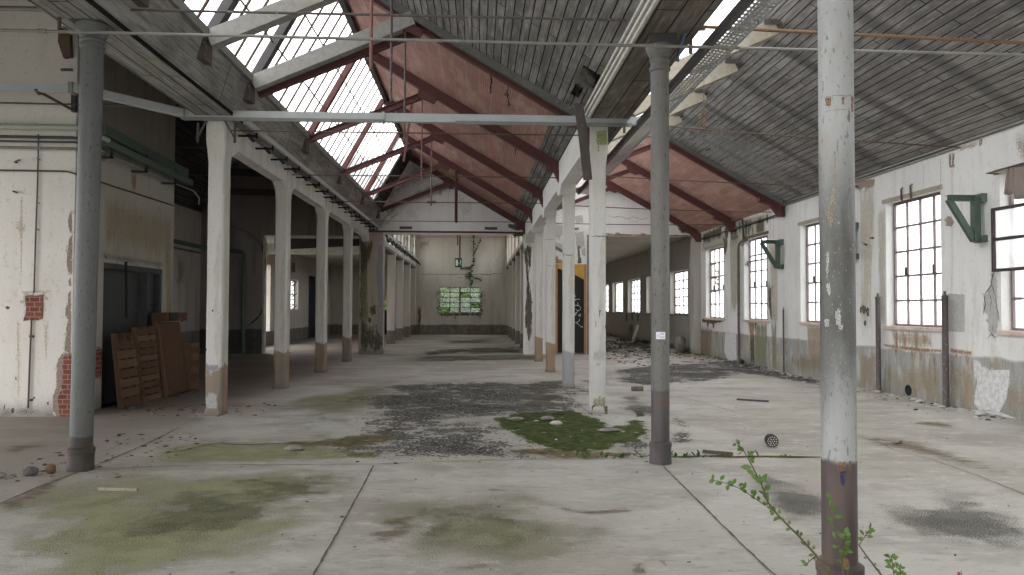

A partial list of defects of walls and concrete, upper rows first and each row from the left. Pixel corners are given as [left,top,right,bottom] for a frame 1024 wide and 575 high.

rust [825,96,854,122]
flaking render [19,292,47,321]
flaking render [51,211,73,417]
peeling [824,310,843,330]
crack [983,272,999,341]
rust [883,329,972,359]
flaking render [972,359,1016,419]